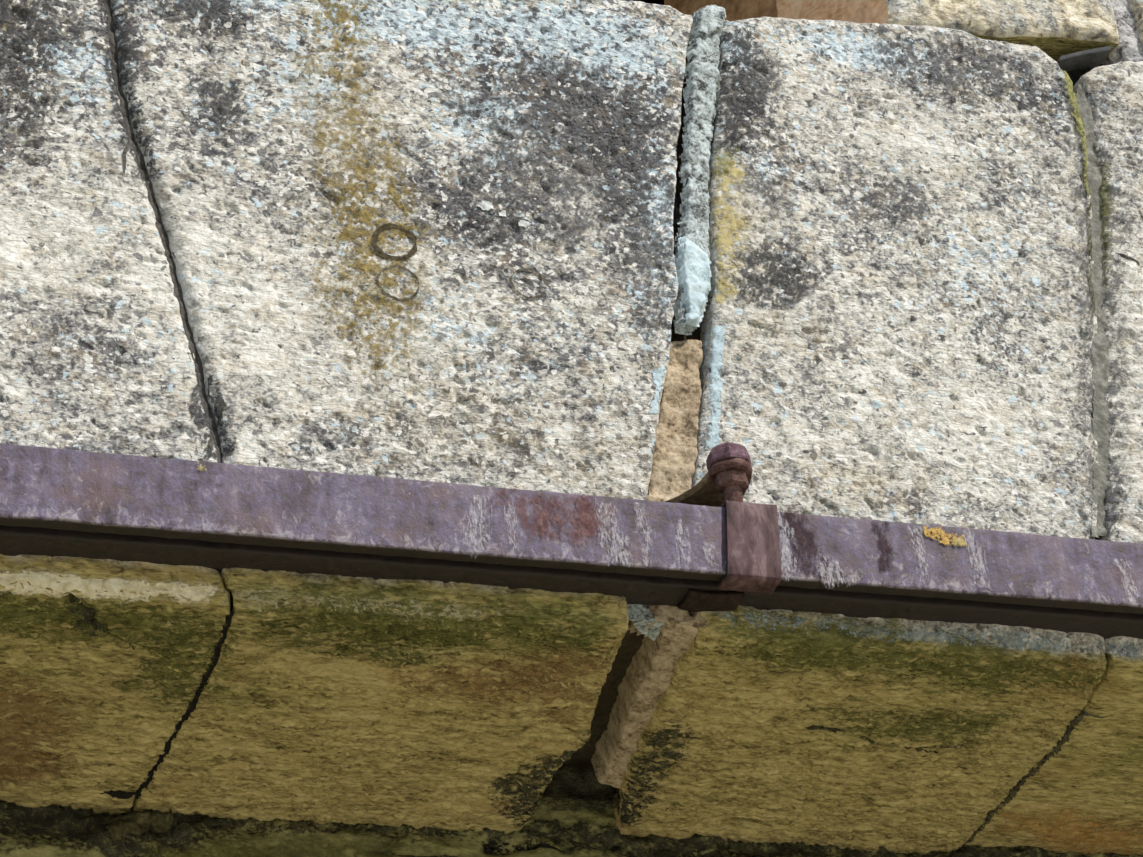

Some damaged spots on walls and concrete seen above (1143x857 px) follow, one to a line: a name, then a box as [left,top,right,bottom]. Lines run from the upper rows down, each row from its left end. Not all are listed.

crack [68,593,135,650]
crack [99,611,235,799]
damp [0,716,1142,857]
crack [966,710,1108,843]